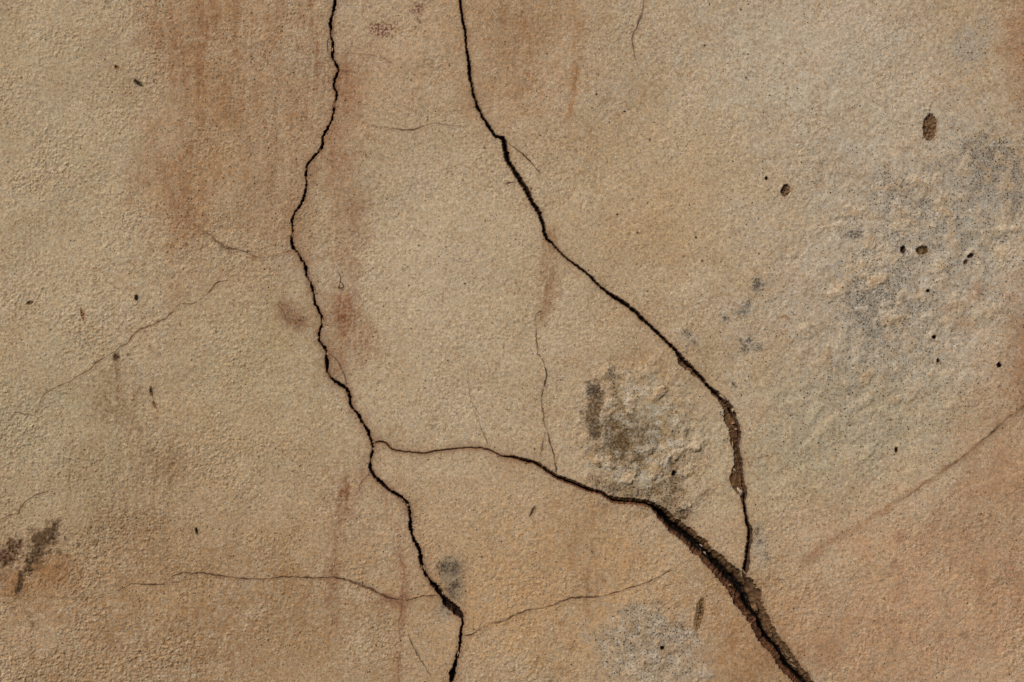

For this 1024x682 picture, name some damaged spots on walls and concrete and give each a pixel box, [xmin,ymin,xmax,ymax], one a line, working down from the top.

damp [0,341,234,682]
crack [0,0,818,682]